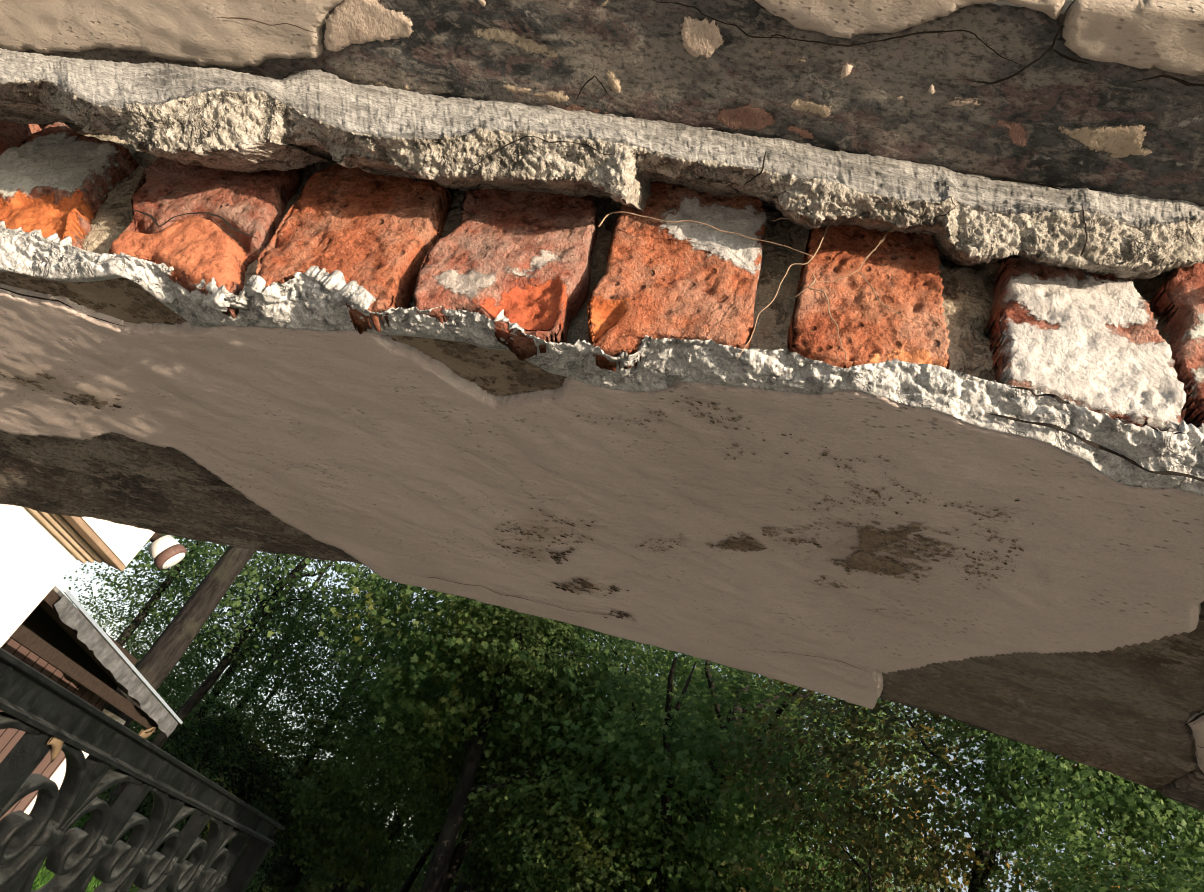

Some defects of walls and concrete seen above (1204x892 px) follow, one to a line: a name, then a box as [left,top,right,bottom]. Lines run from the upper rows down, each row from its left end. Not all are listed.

peeling [0,0,1204,280]
crack [653,0,1092,85]
crack [1124,74,1204,87]
flaking render [0,188,1204,496]
peeling [0,430,362,564]
water stain [576,395,1024,590]
crack [987,387,1204,482]
peeling [881,611,1204,811]
crack [1183,712,1204,748]